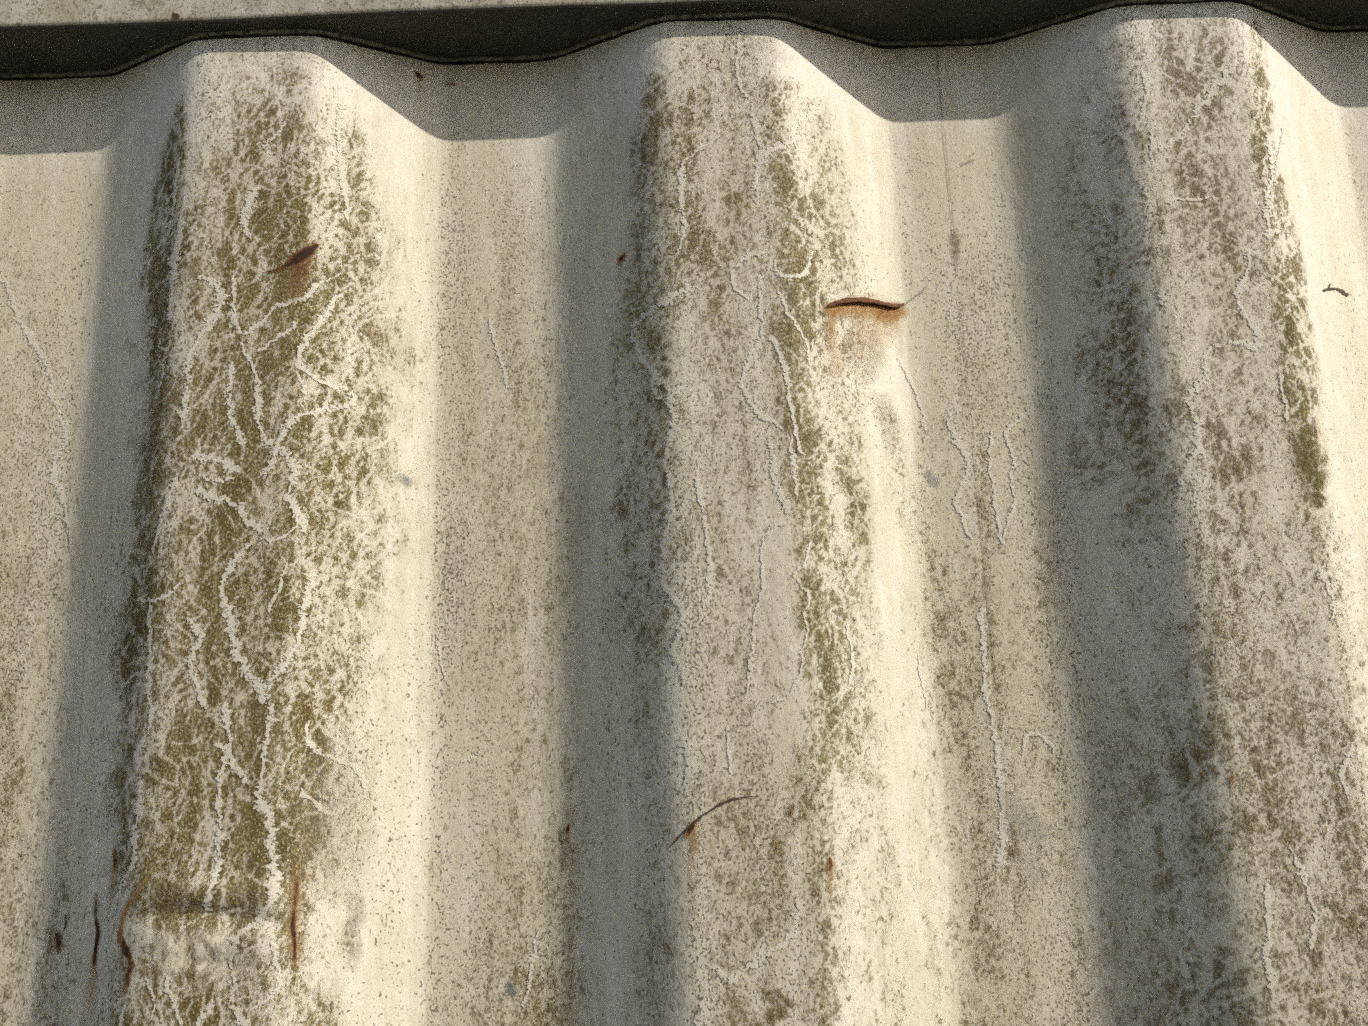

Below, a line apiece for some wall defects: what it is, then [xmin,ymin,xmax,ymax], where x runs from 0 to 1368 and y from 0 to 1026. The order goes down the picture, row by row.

leakage [0,371,76,1026]
rust [48,915,67,953]
rust [90,894,100,981]
rust [116,877,147,995]
leakage [99,37,428,1026]
leakage [444,300,595,1026]